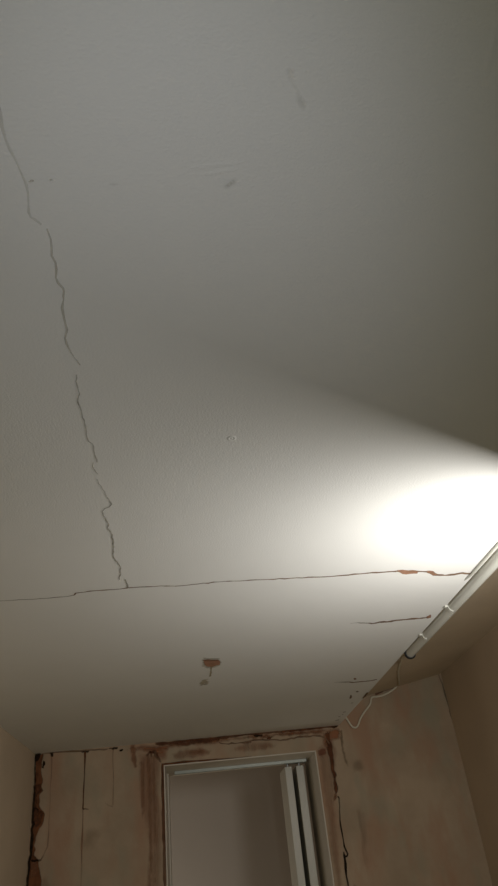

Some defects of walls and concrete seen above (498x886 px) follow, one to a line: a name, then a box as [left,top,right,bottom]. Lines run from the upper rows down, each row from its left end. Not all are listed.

crack [52,257,80,365]
crack [12,501,475,601]
peeling [203,659,220,677]
crack [367,615,431,624]
flaking render [29,753,45,886]